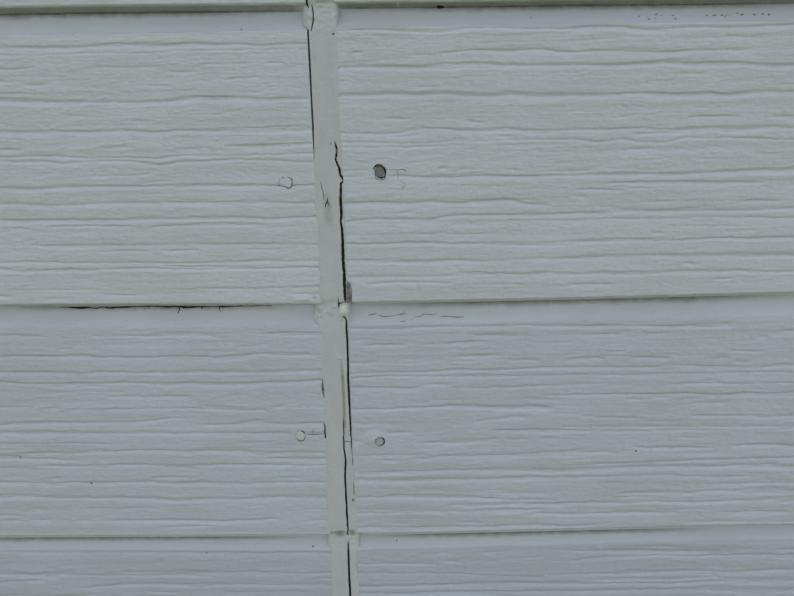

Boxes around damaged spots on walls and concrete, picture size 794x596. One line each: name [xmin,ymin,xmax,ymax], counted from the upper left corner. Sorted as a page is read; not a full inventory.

crack [305,0,354,596]
crack [61,305,272,314]
crack [368,313,465,322]